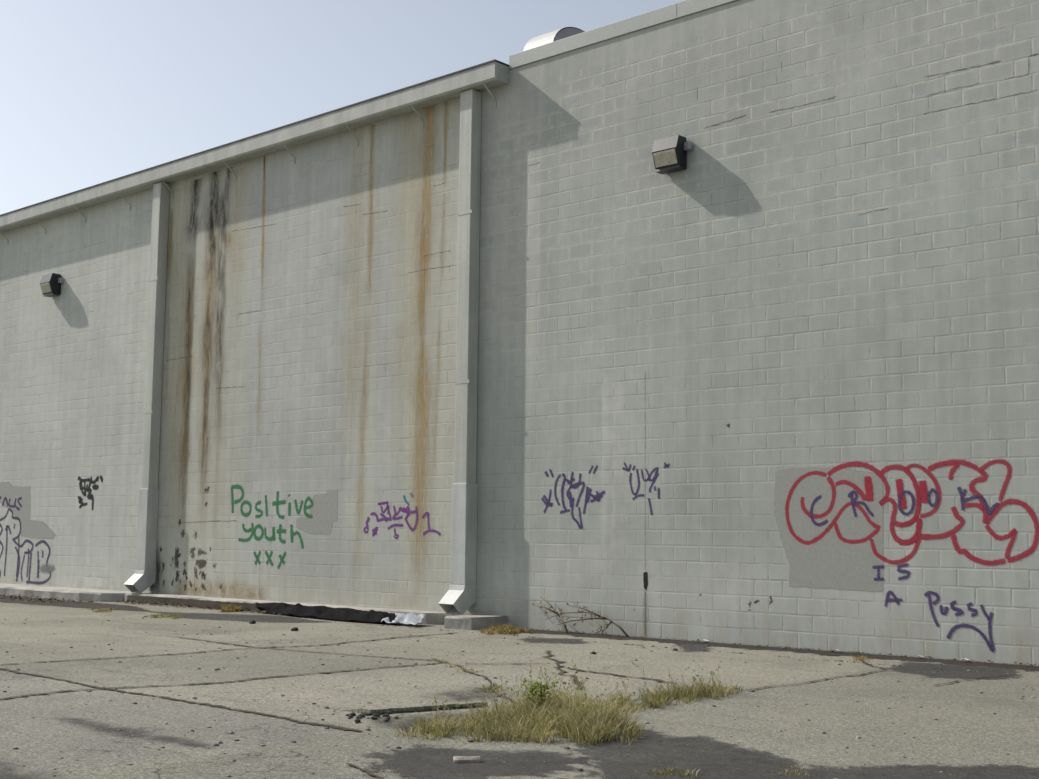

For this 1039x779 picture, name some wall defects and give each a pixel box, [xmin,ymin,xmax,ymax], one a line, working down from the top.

corrosion [420,106,447,319]
corrosion [184,294,192,401]